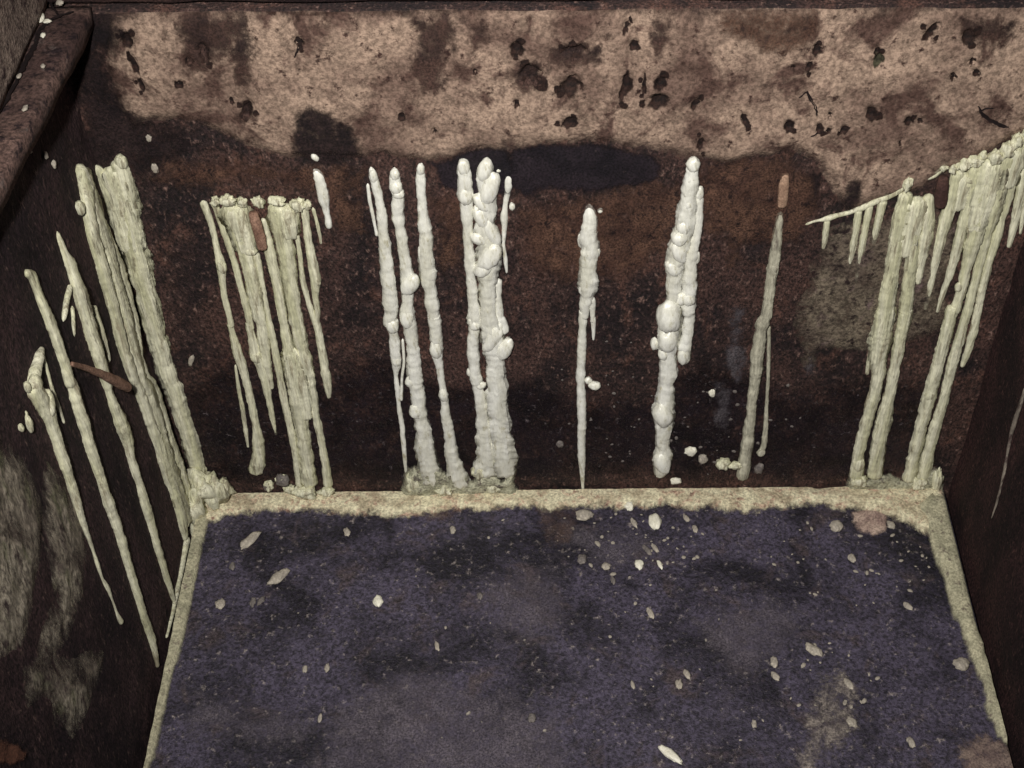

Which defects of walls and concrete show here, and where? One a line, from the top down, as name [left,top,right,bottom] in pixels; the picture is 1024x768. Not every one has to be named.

leakage [24,144,1024,768]
corrosion [702,158,815,263]